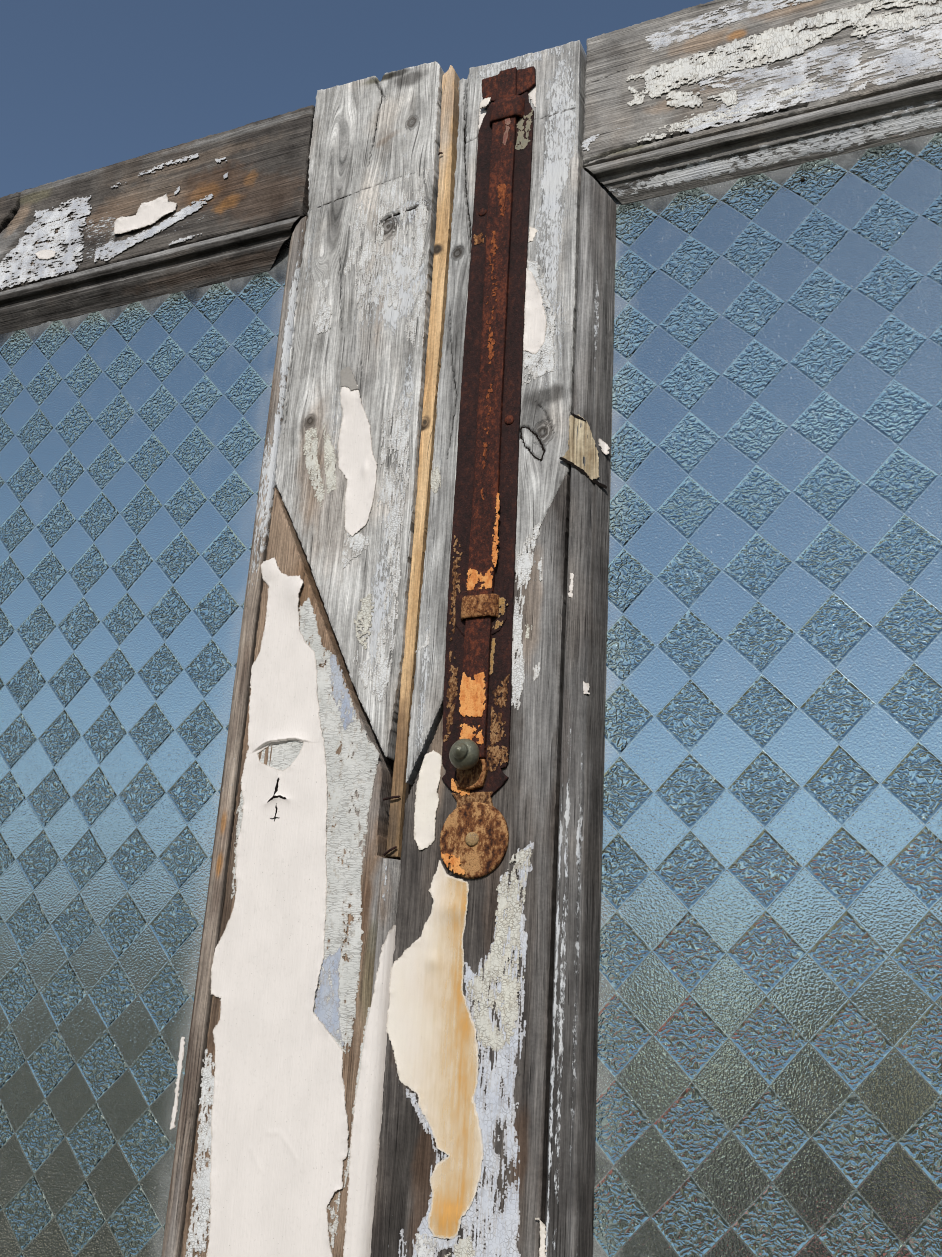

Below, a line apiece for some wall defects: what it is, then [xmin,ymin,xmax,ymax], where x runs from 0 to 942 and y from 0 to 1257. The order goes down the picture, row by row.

peeling [626,0,942,108]
rust [503,109,533,150]
peeling [637,124,668,143]
peeling [35,249,56,260]
peeling [114,194,177,234]
rust [497,183,510,217]
rust [474,231,498,364]
peeling [338,367,388,537]
rust [482,384,493,469]
rust [444,488,510,772]
rust [451,778,470,796]
peeling [206,557,532,1257]